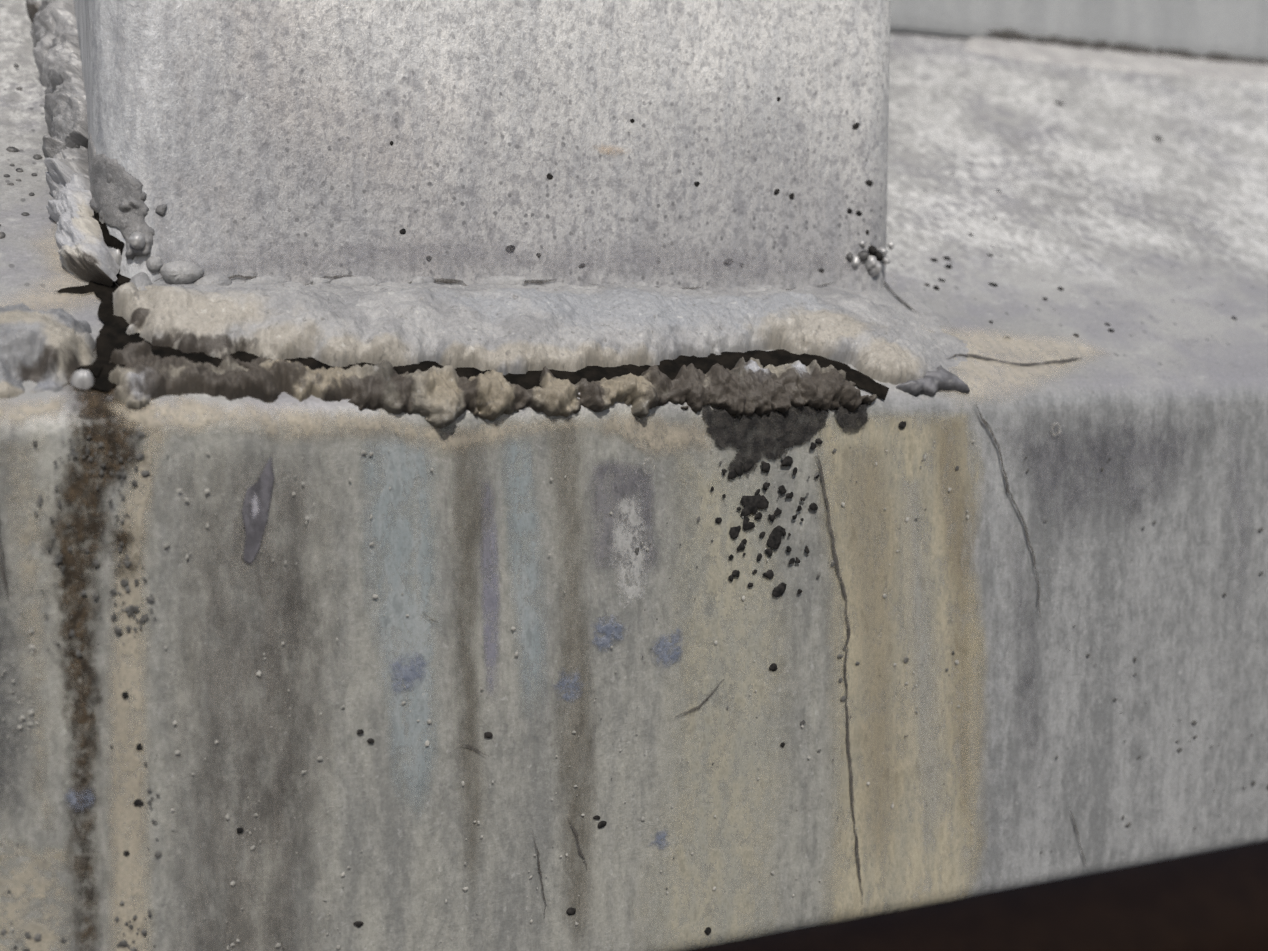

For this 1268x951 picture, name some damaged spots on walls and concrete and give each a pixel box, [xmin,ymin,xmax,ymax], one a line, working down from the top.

corrosion [50,375,161,951]
water stain [203,486,303,951]
water stain [121,399,541,791]
crack [57,211,889,400]
water stain [594,464,654,563]
water stain [603,418,706,451]
water stain [654,478,770,951]
peeling [702,402,869,597]
crack [818,457,863,902]
peeling [896,365,970,397]
water stain [1026,428,1186,509]
water stain [0,850,65,951]